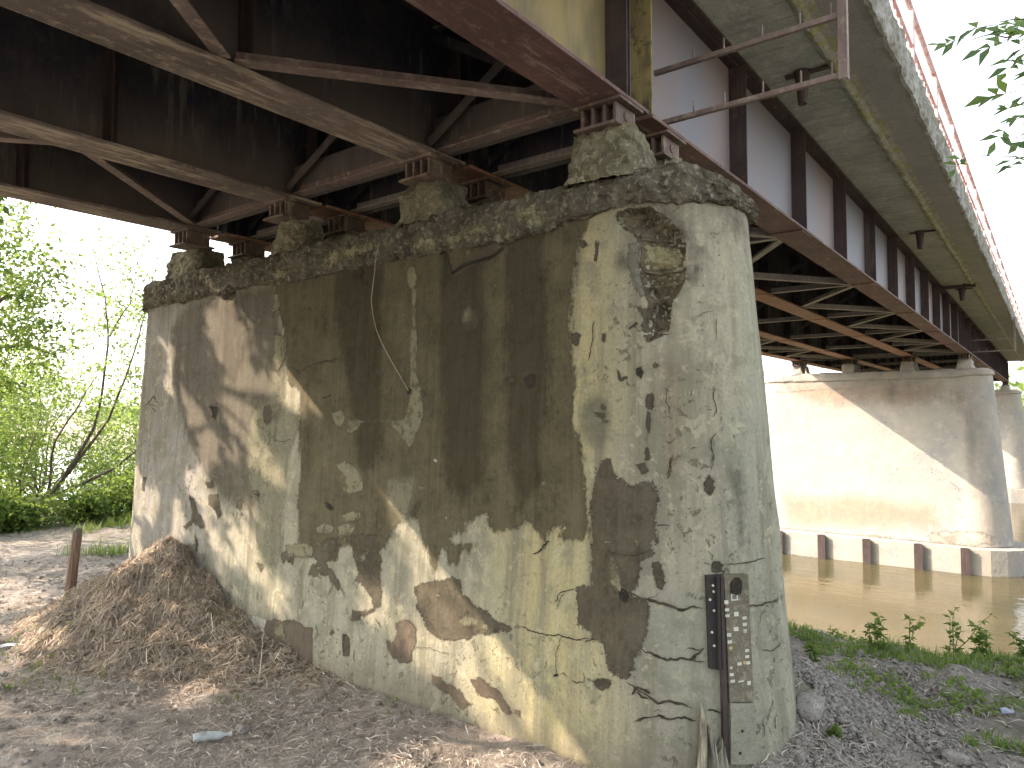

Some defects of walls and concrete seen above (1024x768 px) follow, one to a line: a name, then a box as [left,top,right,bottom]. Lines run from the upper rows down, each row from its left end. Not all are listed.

spalling [616,206,686,343]
leakage [172,202,660,679]
peeling [636,447,650,474]
peeling [652,561,666,590]
peeling [247,615,313,666]
peeling [386,576,518,664]
crack [518,589,593,684]
crack [627,592,702,612]
crack [642,648,704,662]
peeling [432,675,520,717]
crack [626,682,721,723]